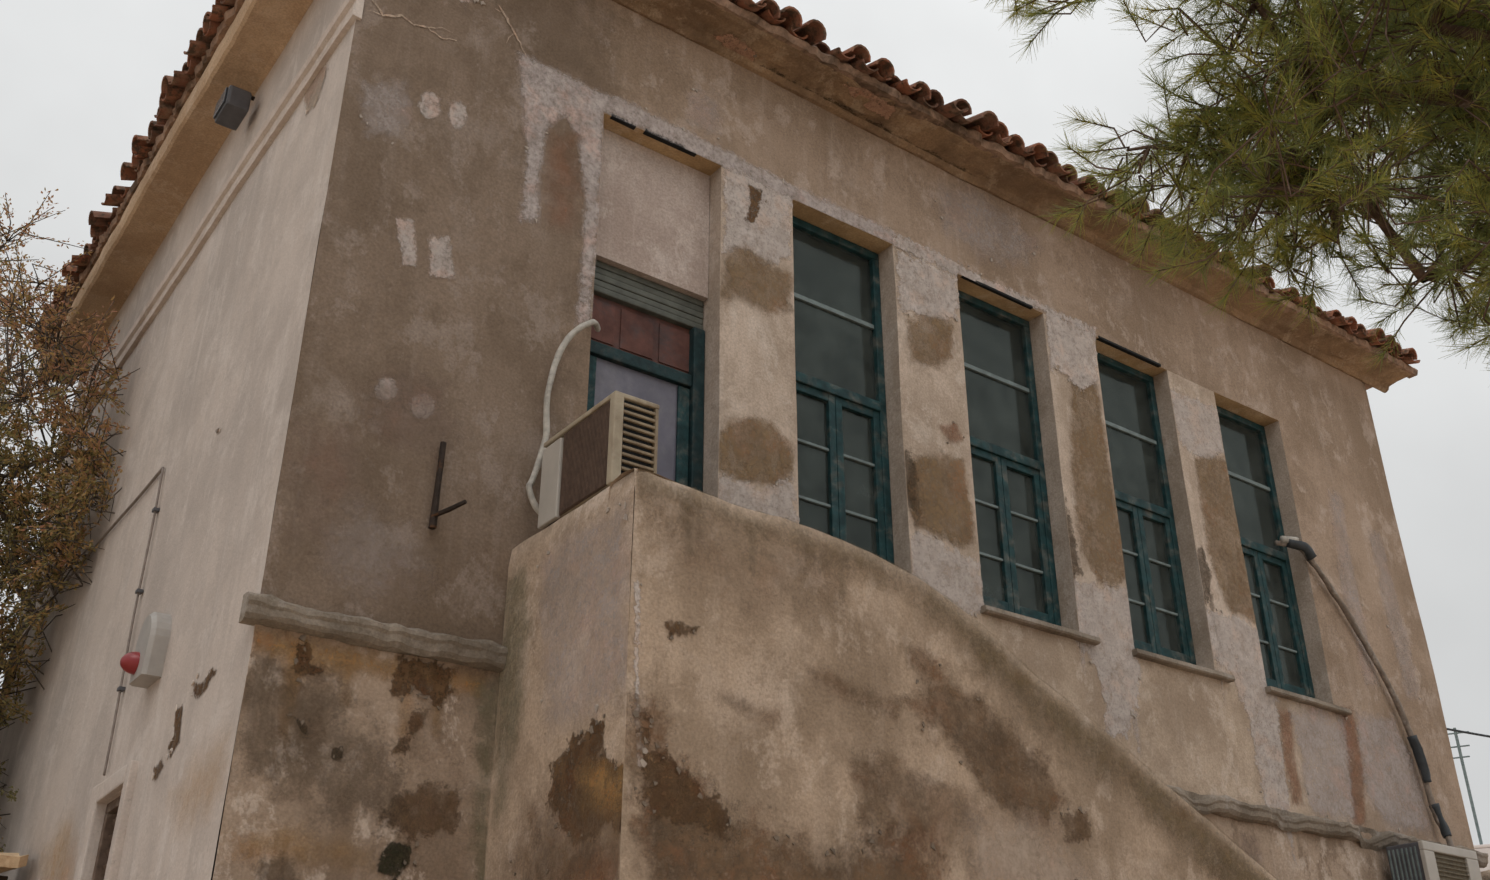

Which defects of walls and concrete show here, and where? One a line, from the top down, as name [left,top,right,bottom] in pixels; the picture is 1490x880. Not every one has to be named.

flaking render [151,668,216,781]
flaking render [389,654,456,710]
flaking render [545,581,732,846]
water stain [906,649,1065,826]
water stain [931,595,1269,880]